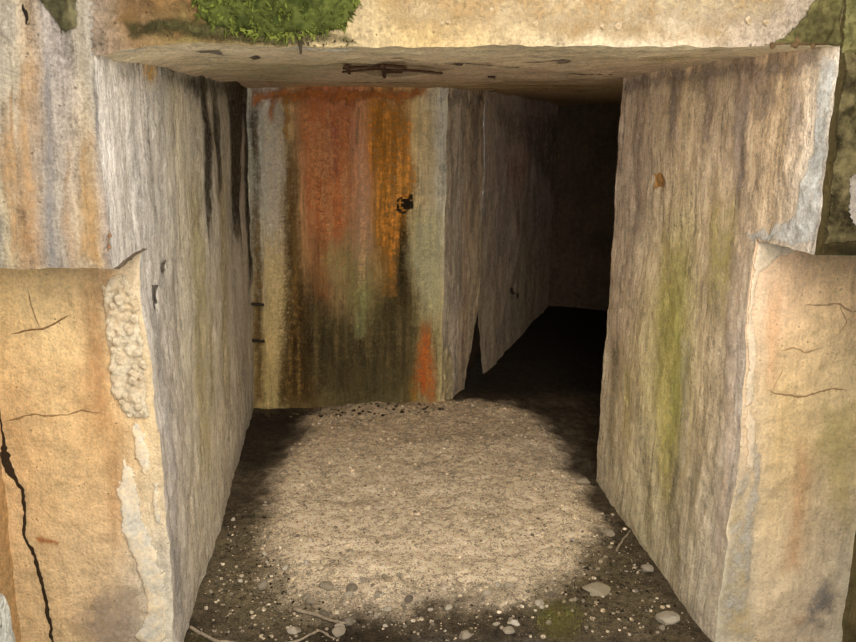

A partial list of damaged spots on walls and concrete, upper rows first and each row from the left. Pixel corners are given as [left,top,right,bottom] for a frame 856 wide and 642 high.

corrosion [252,87,425,276]
peeling [848,173,856,225]
leakage [170,71,419,404]
crack [10,293,69,335]
crack [807,303,856,333]
corrosion [412,327,435,403]
crack [769,347,848,398]
crack [0,409,103,642]